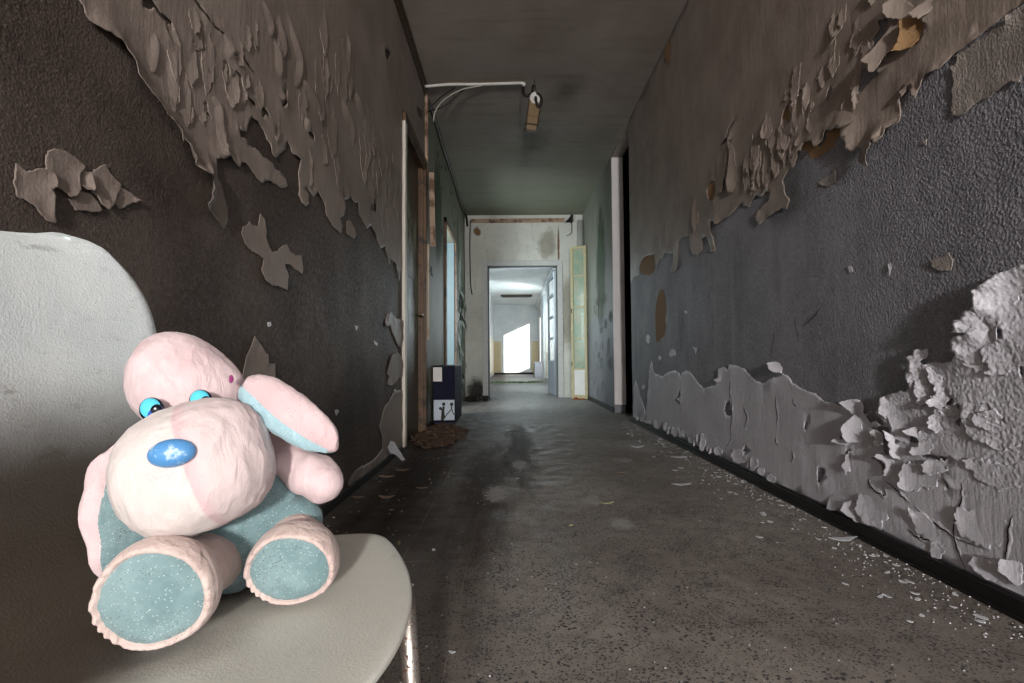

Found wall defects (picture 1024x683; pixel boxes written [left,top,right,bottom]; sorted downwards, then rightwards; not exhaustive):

peeling [13,148,143,223]
peeling [79,0,424,290]
peeling [628,0,1024,282]
peeling [348,312,405,486]
peeling [633,264,1024,597]